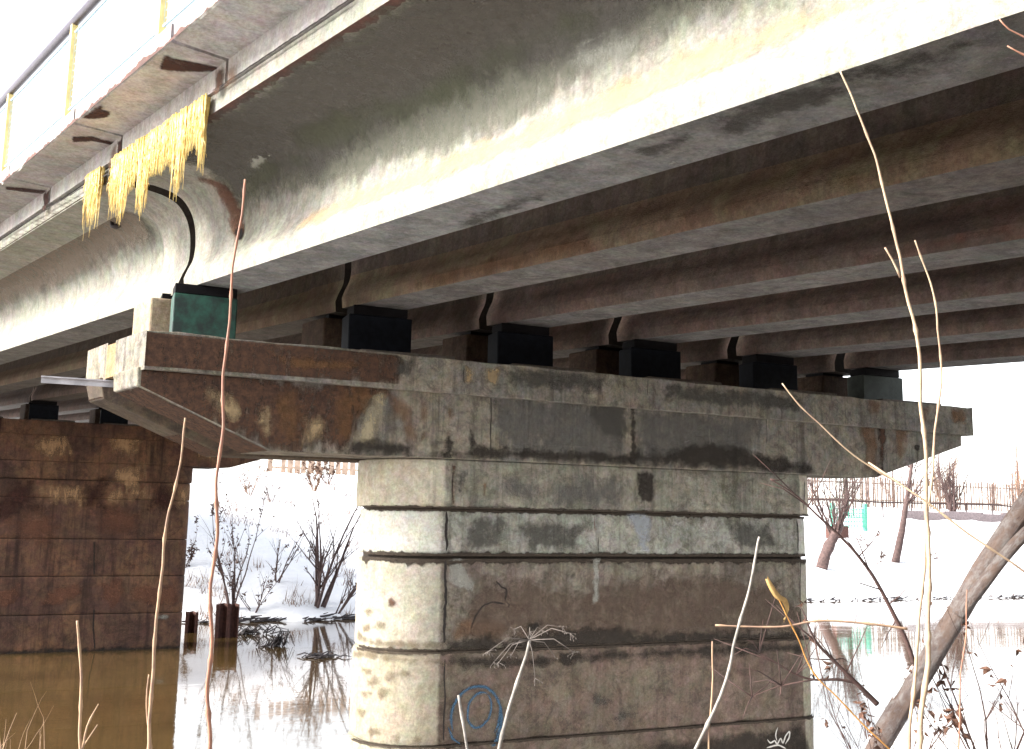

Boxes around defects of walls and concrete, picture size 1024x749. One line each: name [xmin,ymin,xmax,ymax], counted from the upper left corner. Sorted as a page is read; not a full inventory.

rust [198,178,244,241]
rust [117,332,412,456]
damp [353,439,410,457]
damp [440,368,812,505]
rust [863,427,905,477]
damp [467,517,505,549]
damp [521,523,580,551]
damp [729,522,774,547]
crack [471,581,509,628]